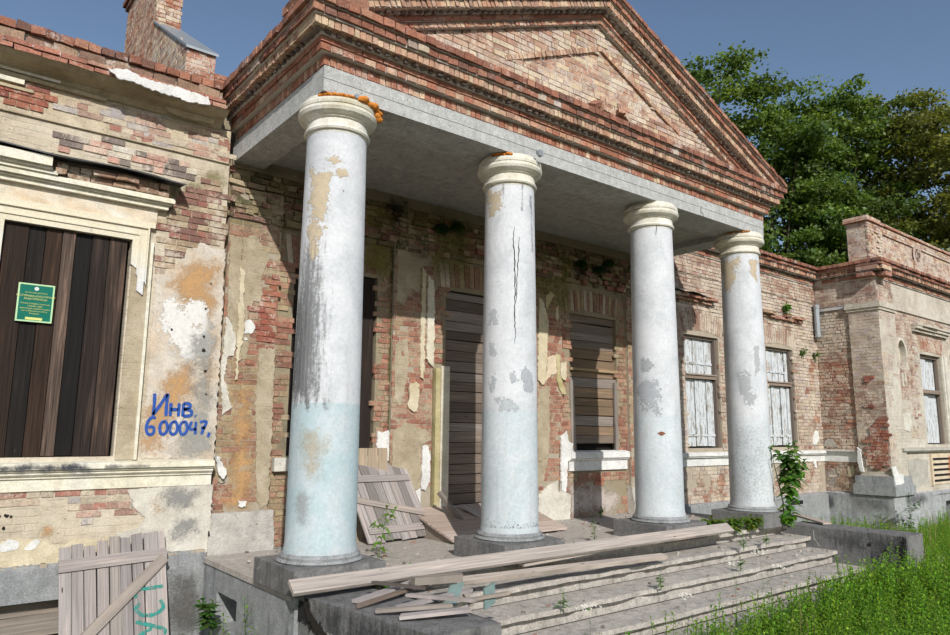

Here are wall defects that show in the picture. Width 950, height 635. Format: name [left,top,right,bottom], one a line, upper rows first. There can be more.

peeling [0,68,281,568]
damp [227,165,304,231]
damp [293,248,326,409]
peeling [307,155,349,260]
damp [364,198,485,266]
crack [512,226,520,341]
damp [532,239,631,294]
peeling [392,243,435,504]
peeling [637,357,662,415]
peeling [736,345,760,409]
flaking render [835,404,904,490]
crack [304,598,333,635]